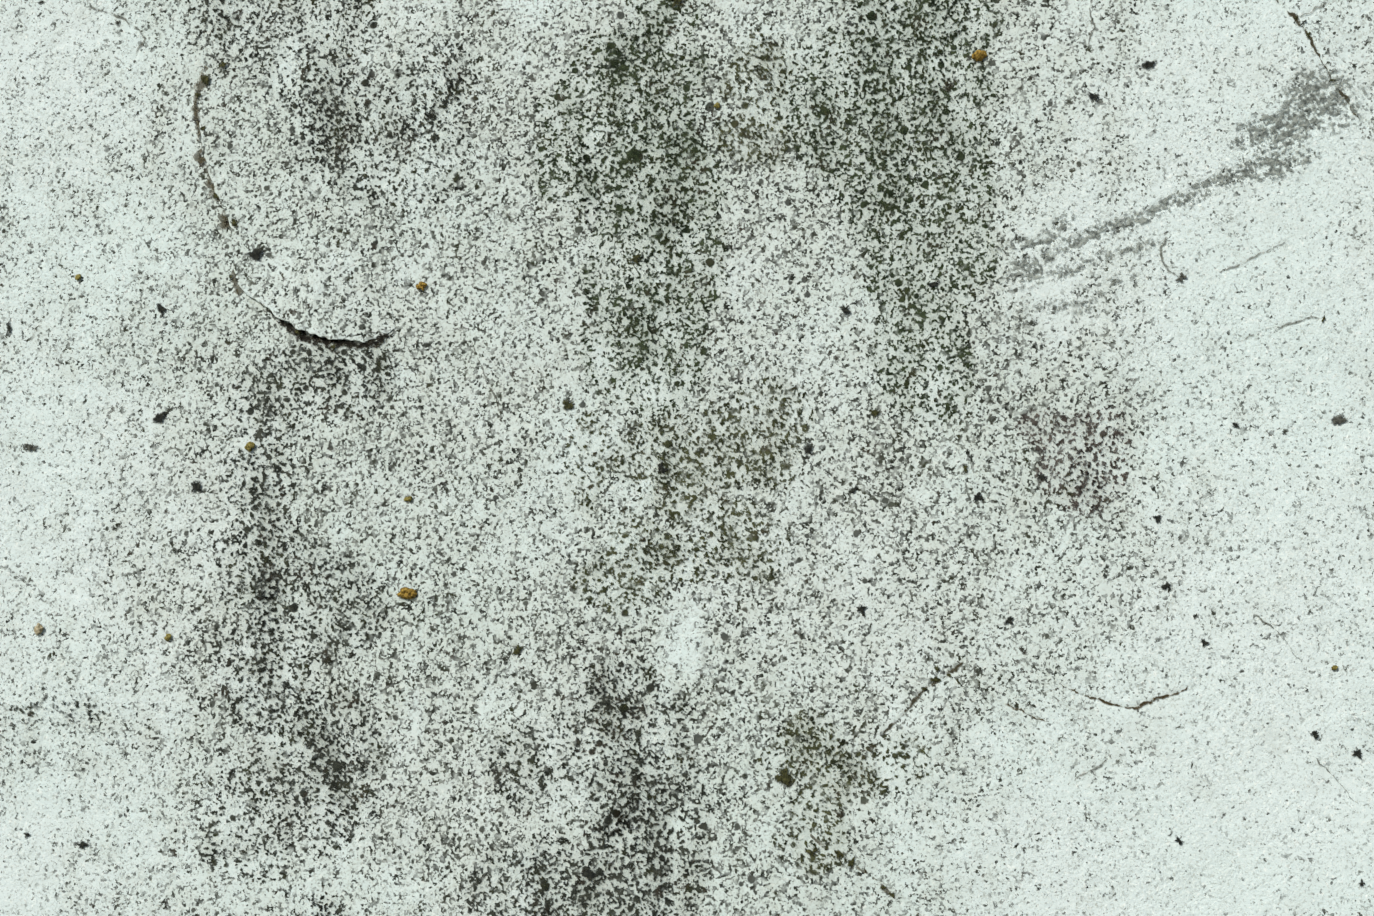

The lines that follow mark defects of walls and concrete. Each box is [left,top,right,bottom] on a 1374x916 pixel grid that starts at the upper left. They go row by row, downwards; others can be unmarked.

mould [187,0,483,213]
crack [1277,0,1374,130]
water stain [245,248,262,260]
water stain [533,0,1005,616]
crack [1157,234,1179,322]
crack [1220,242,1285,272]
mould [1015,407,1131,514]
mould [203,339,401,882]
mould [463,657,714,916]
mould [755,710,932,874]
mould [291,896,349,916]